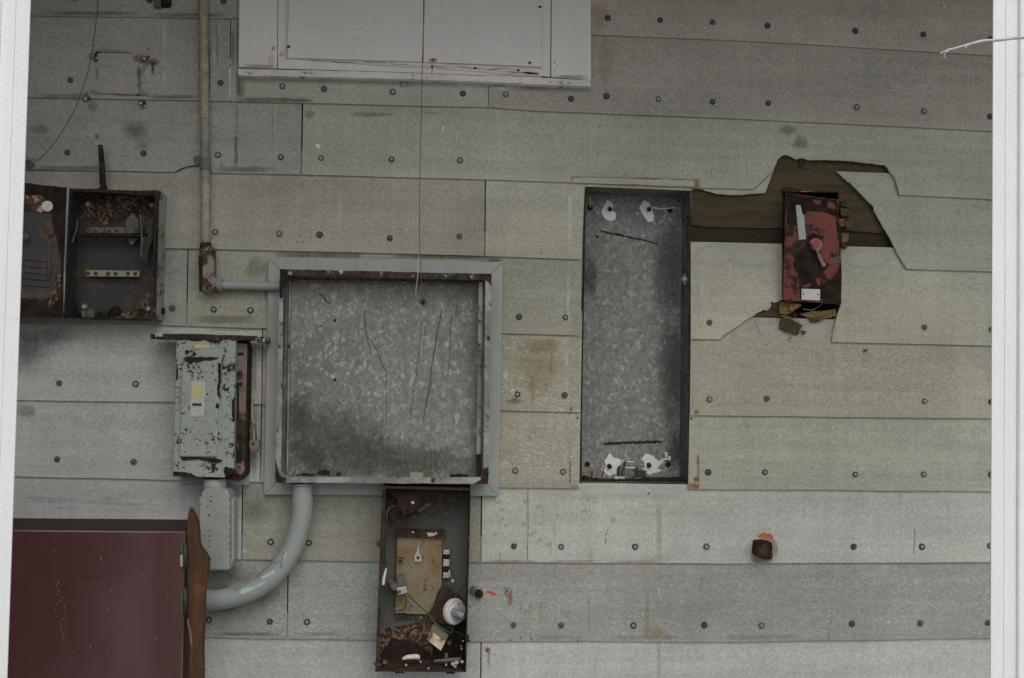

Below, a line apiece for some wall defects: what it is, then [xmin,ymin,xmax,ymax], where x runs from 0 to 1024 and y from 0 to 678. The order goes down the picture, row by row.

spalling [753,187,854,335]